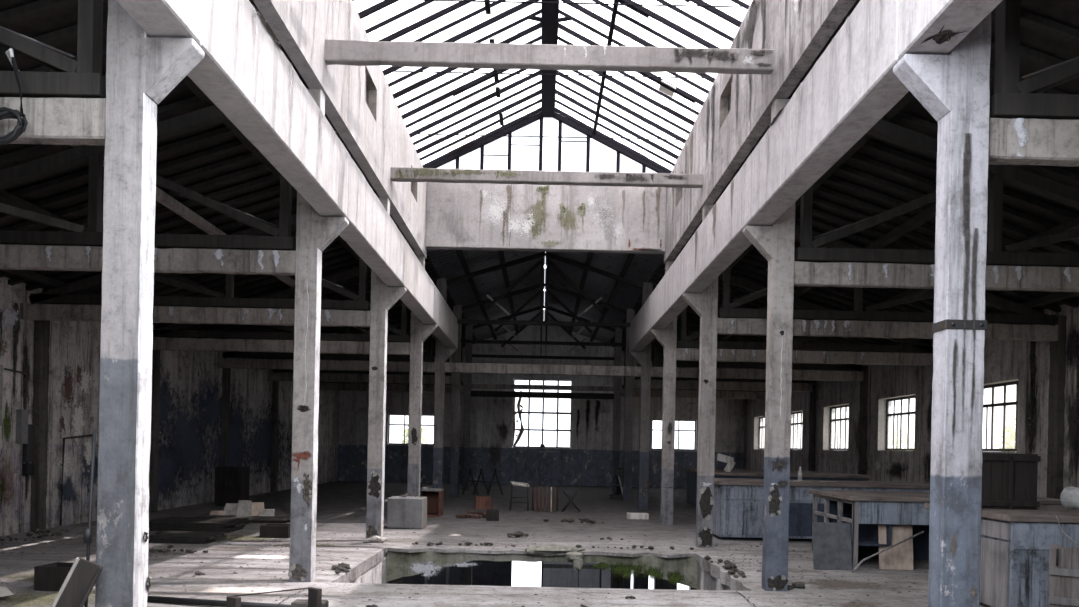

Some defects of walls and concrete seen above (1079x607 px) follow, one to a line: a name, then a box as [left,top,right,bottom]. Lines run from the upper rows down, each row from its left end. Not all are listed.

leakage [731,30,752,132]
leakage [480,171,546,243]
leakage [582,174,631,244]
leakage [642,174,691,231]
corrosion [292,452,310,467]
spalling [294,473,312,508]
spalling [698,482,714,548]
spalling [768,483,782,517]
spalling [288,563,308,581]
spalling [767,575,788,591]